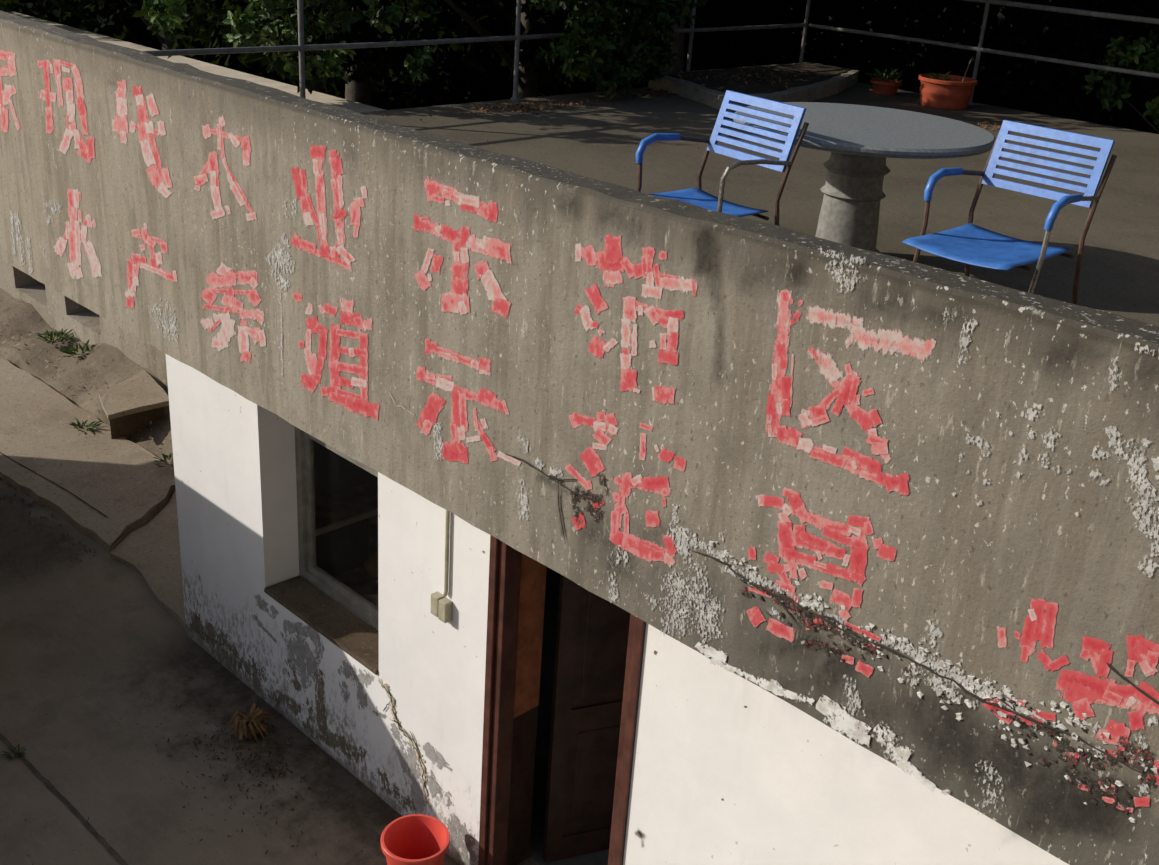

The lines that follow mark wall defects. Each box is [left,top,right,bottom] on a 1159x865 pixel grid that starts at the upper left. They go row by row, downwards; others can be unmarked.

crack [504,453,603,545]
crack [378,678,432,809]
peeling [338,660,478,865]
flaking render [667,504,1158,815]
crack [683,530,1159,823]